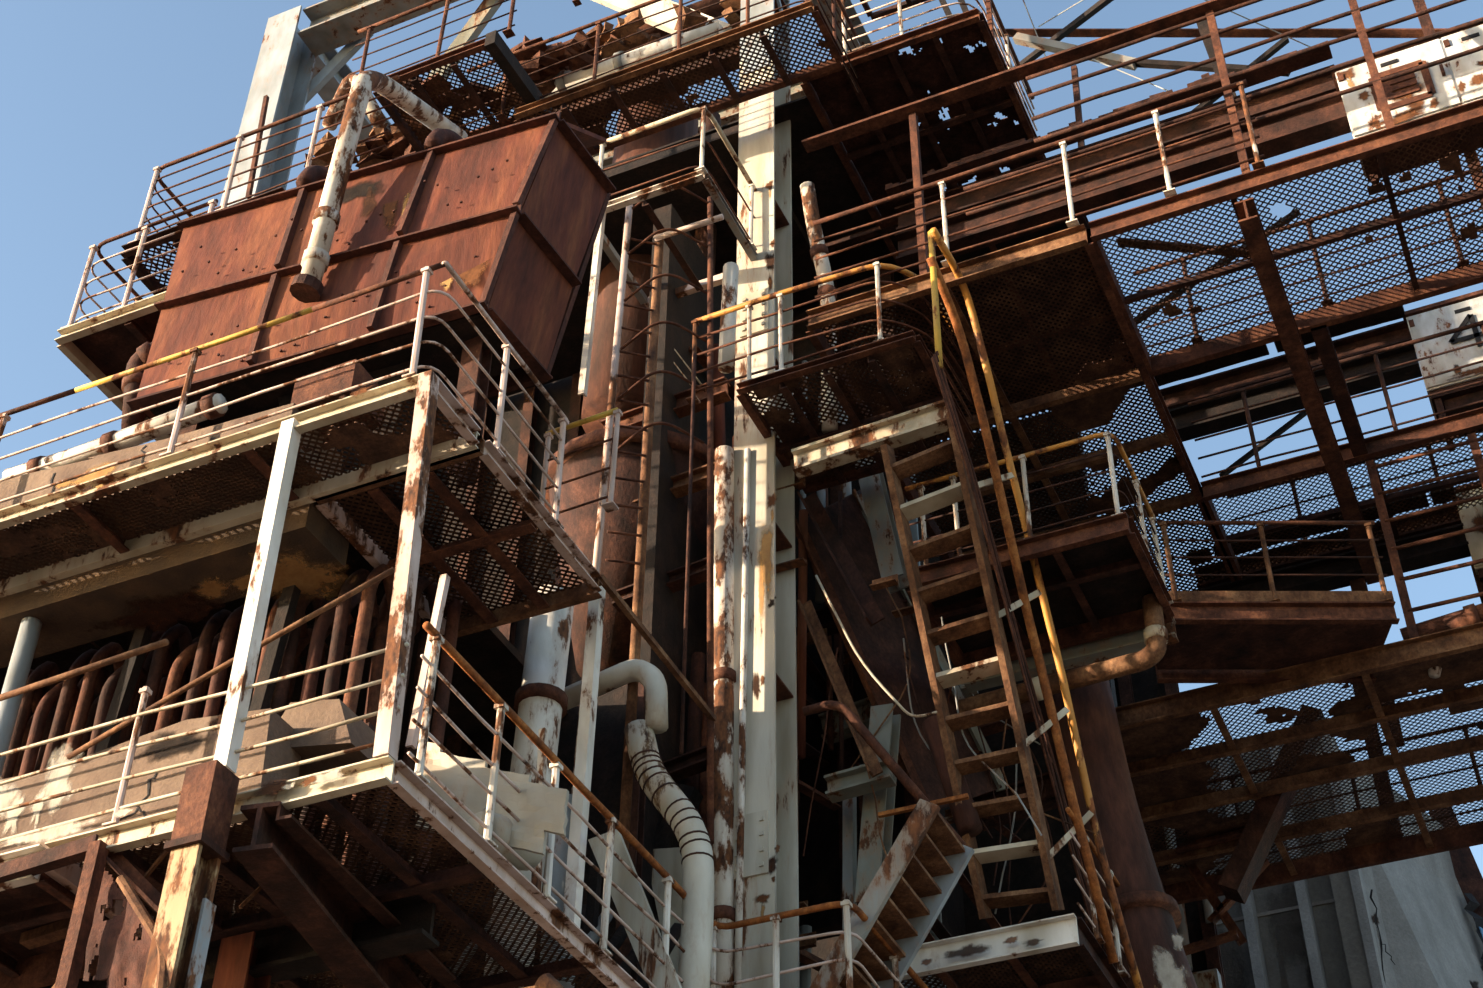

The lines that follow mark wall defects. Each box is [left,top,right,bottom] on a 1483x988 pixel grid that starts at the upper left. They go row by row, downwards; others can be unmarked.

rust [1458,61,1483,92]
rust [1336,68,1439,129]
rust [342,181,410,229]
rust [442,260,488,289]
rust [1447,365,1483,381]
rust [758,494,777,617]
rust [752,674,765,699]
peeling [283,768,341,789]
peeling [5,819,94,846]
rust [756,845,780,916]
peeling [1154,935,1185,988]